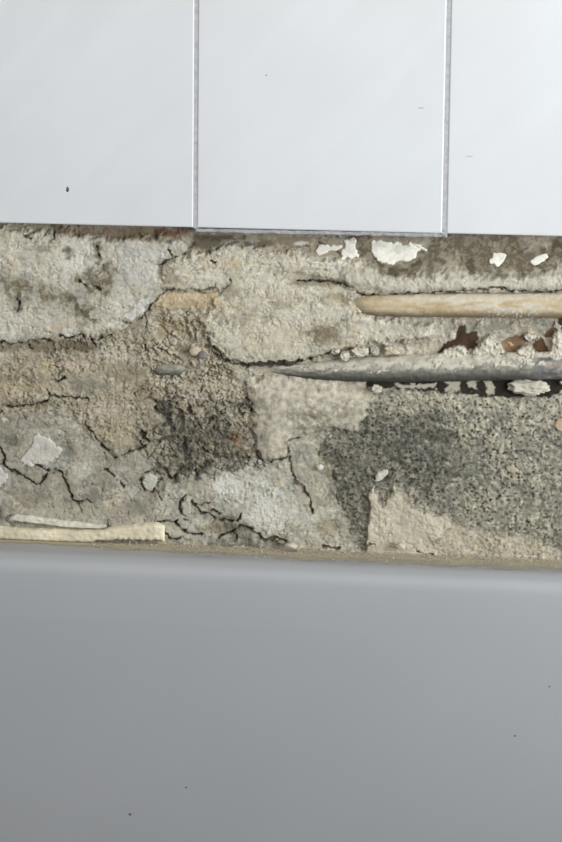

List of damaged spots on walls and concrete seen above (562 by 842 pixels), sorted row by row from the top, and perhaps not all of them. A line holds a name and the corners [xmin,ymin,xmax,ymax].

peeling [315,237,359,260]
peeling [370,239,427,265]
peeling [489,252,507,267]
peeling [530,253,548,266]
corrosion [438,325,479,354]
corrosion [501,318,562,352]
crack [211,349,328,368]
damp [150,396,251,482]
crack [0,447,83,504]
crack [256,437,313,514]
spalling [316,379,562,551]
crack [157,496,260,540]